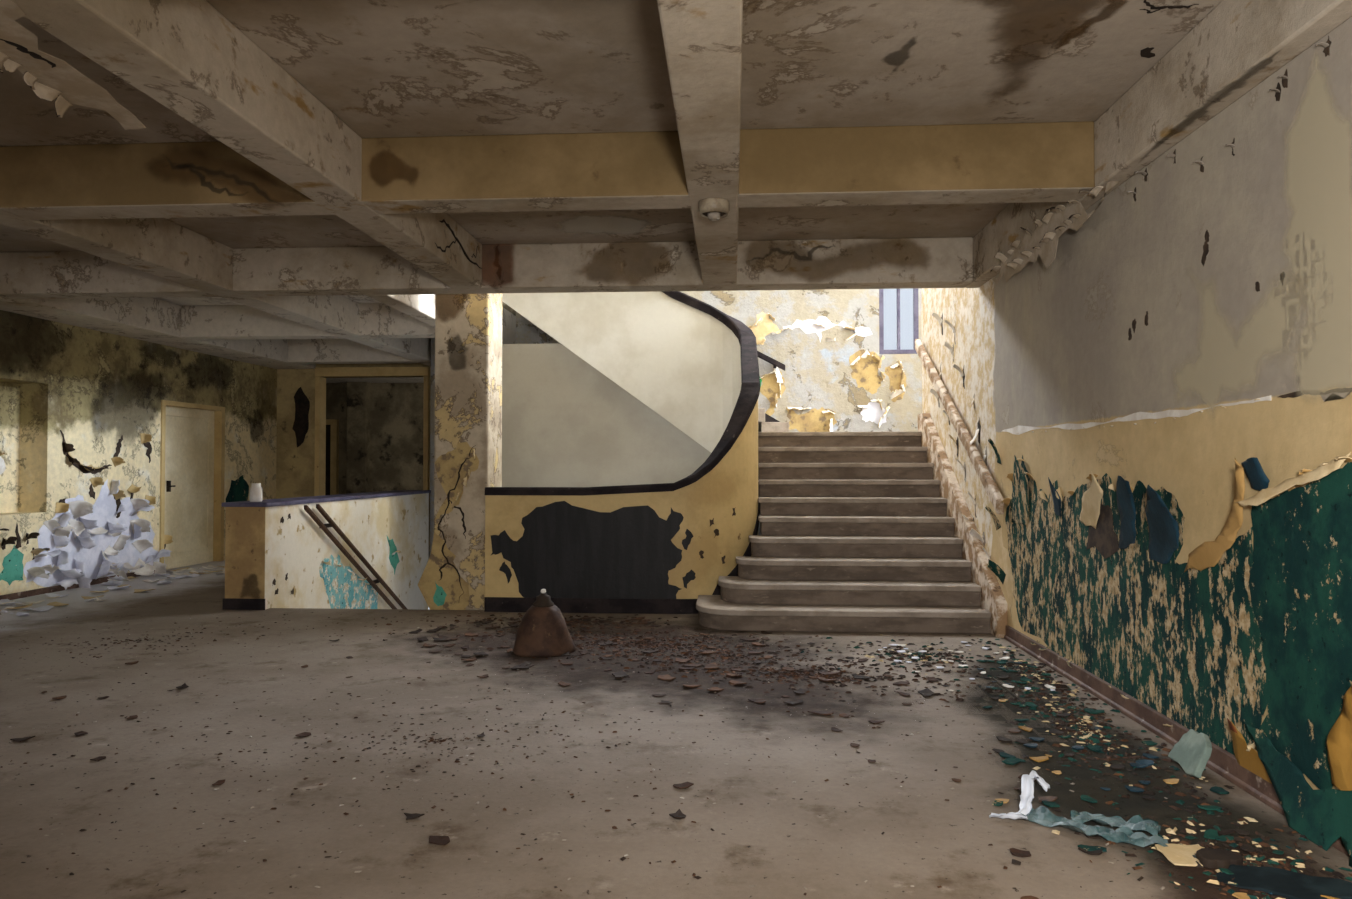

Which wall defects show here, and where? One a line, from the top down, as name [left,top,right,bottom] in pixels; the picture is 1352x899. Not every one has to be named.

water stain [986,0,1125,70]
peeling [0,433,173,591]
peeling [930,311,1352,867]